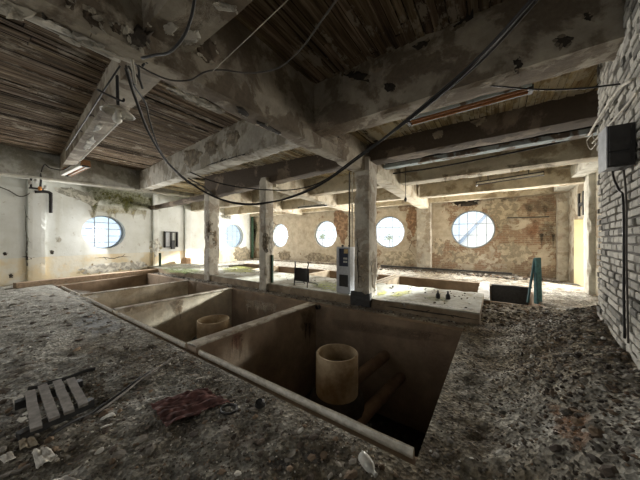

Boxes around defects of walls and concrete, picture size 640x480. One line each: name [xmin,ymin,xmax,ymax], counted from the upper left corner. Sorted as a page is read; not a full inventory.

peeling [0,0,155,63]
spalling [163,22,219,65]
spalling [552,34,574,51]
water stain [86,187,152,217]
spalling [334,210,348,245]
spalling [406,206,417,237]
peeling [452,197,520,234]
peeling [77,237,162,275]
peeling [496,242,533,266]